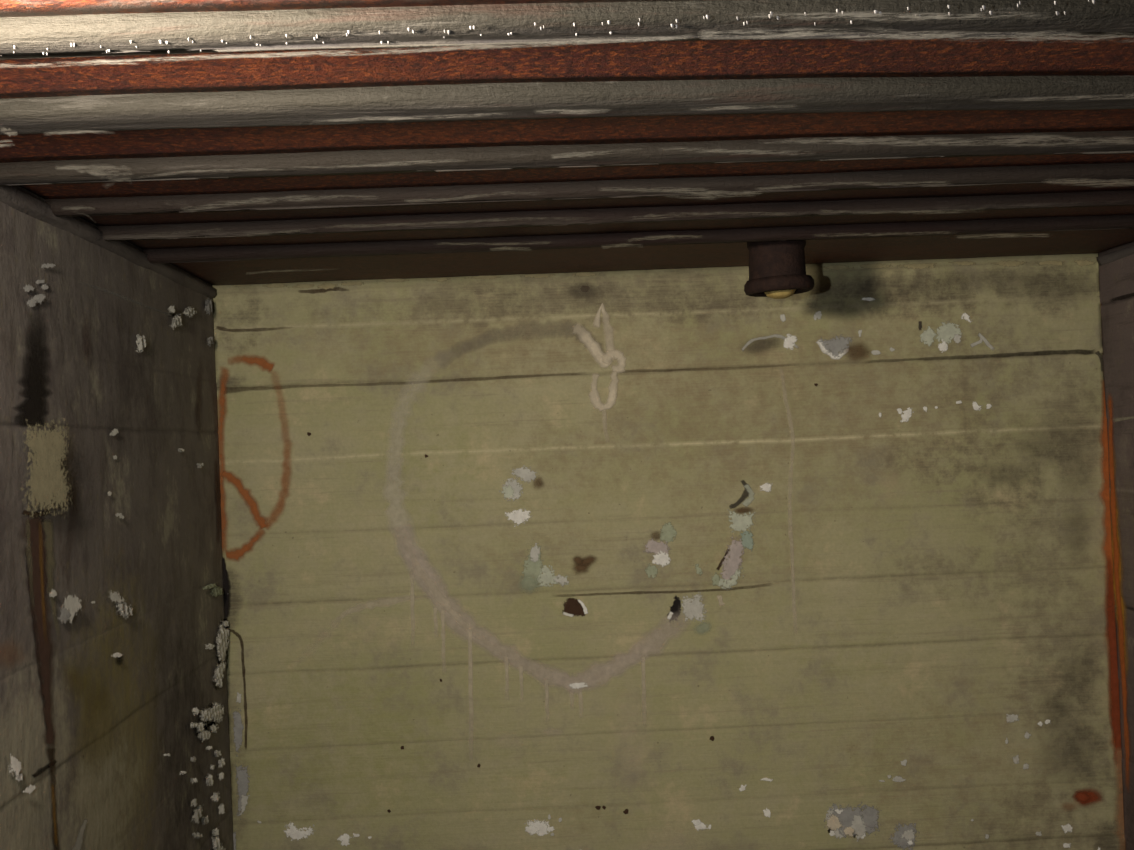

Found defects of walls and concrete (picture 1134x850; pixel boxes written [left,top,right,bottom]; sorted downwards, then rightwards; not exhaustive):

peeling [817,330,895,359]
peeling [919,313,994,353]
peeling [499,465,542,527]
peeling [695,480,772,605]
spalling [17,329,95,850]
peeling [107,590,133,618]
peeling [521,543,595,617]
spalling [667,594,709,633]
corrosion [1101,388,1129,844]
peeling [205,621,230,687]
peeling [8,754,36,794]
peeling [179,692,250,850]